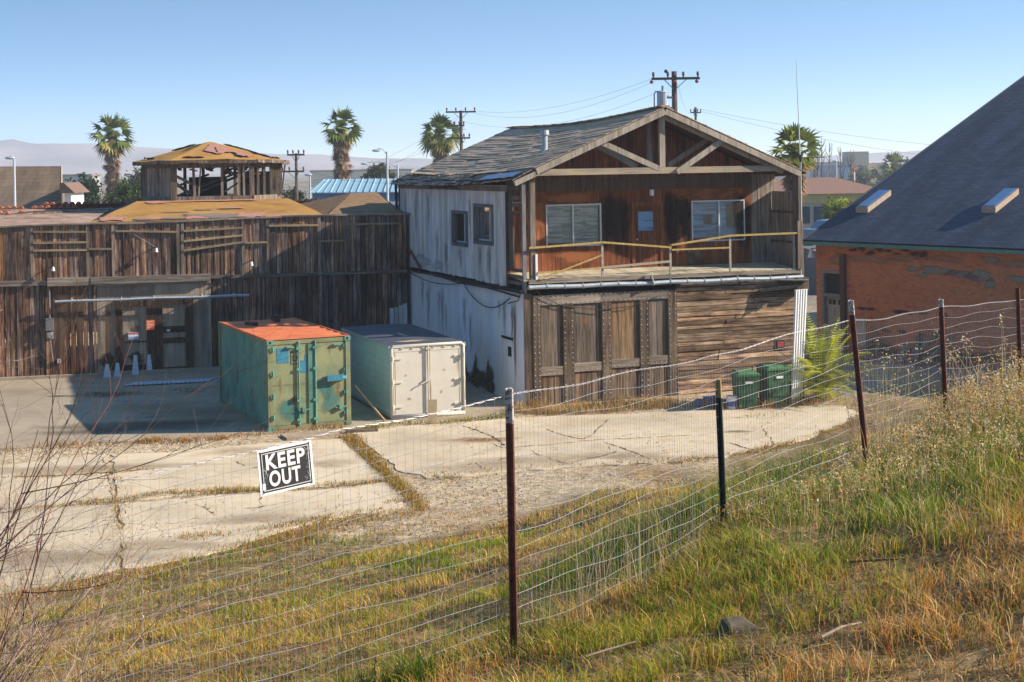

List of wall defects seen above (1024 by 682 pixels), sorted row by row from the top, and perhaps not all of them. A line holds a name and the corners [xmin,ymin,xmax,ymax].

spalling [849,247,1024,288]
crack [462,419,679,469]